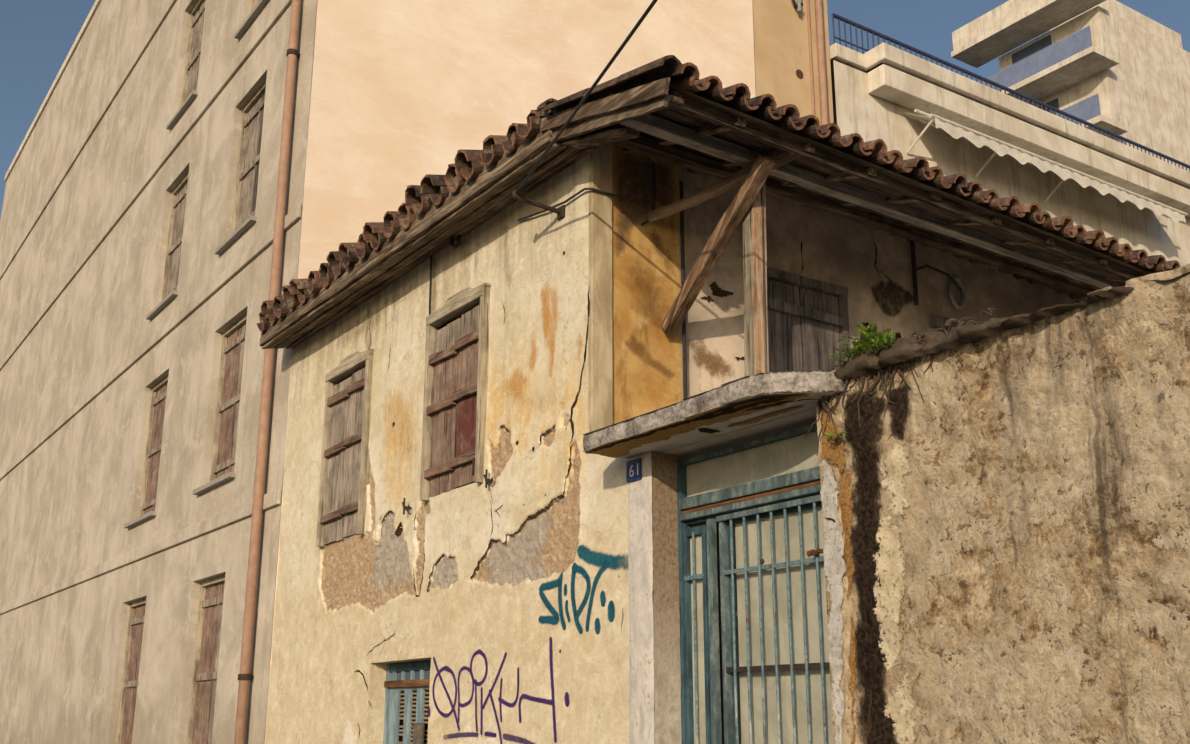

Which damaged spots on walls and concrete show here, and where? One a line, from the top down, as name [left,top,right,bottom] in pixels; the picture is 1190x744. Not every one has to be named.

crack [566,290,820,454]
flaking render [872,280,913,316]
flaking render [321,395,809,613]
peeling [820,459,846,744]
damp [844,385,910,744]